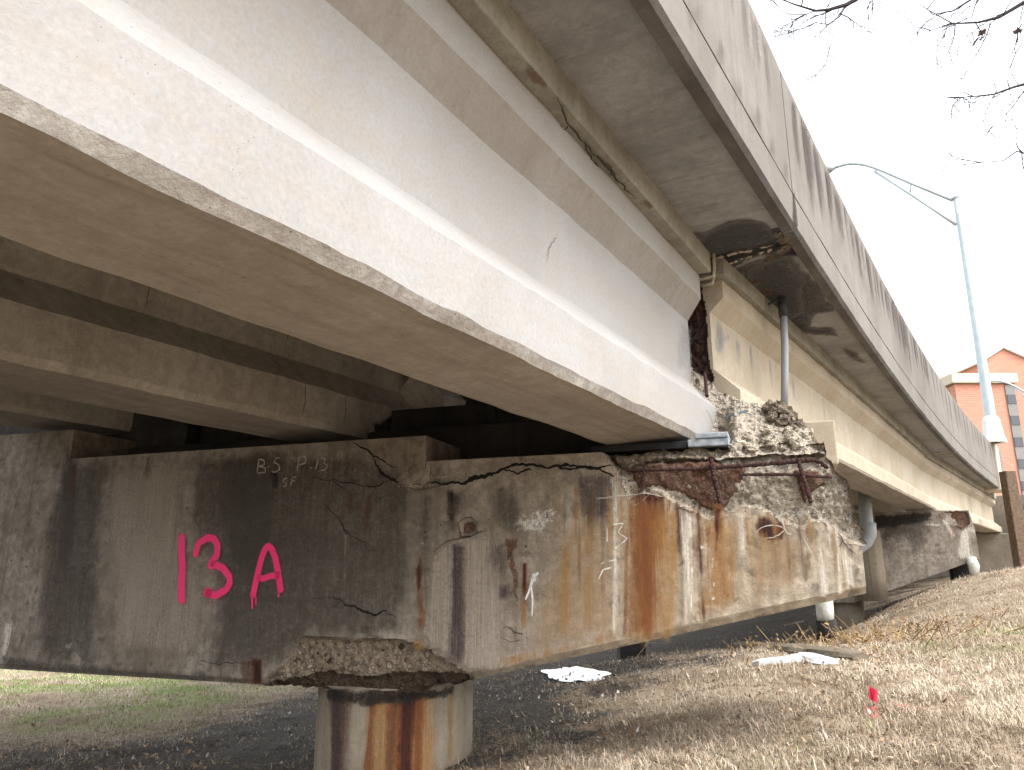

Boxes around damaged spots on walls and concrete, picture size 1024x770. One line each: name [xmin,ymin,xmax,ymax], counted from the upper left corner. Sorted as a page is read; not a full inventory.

crack [557,97,635,199]
leakage [694,220,837,336]
spalling [608,323,867,546]
crack [311,597,442,627]
spalling [257,516,601,693]
crack [308,441,619,551]
rust [506,538,527,624]
rust [563,489,680,639]
rust [694,504,734,620]
rust [756,517,784,540]
rust [331,692,353,770]
rust [364,692,432,770]